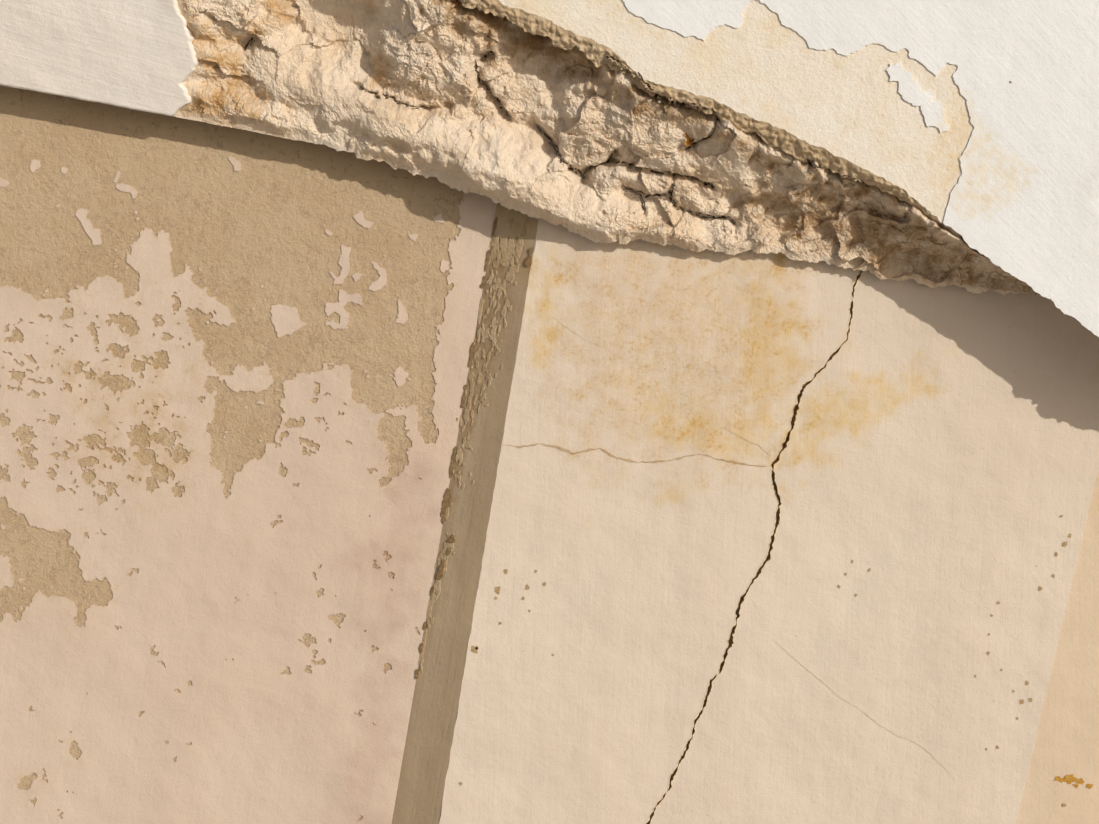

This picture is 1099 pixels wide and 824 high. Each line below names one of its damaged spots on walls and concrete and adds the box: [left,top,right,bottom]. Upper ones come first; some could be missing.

flaking render [0,0,1046,679]
crack [501,270,863,824]
peeling [59,731,82,760]
peeling [17,768,48,806]
corrosion [1054,774,1093,789]